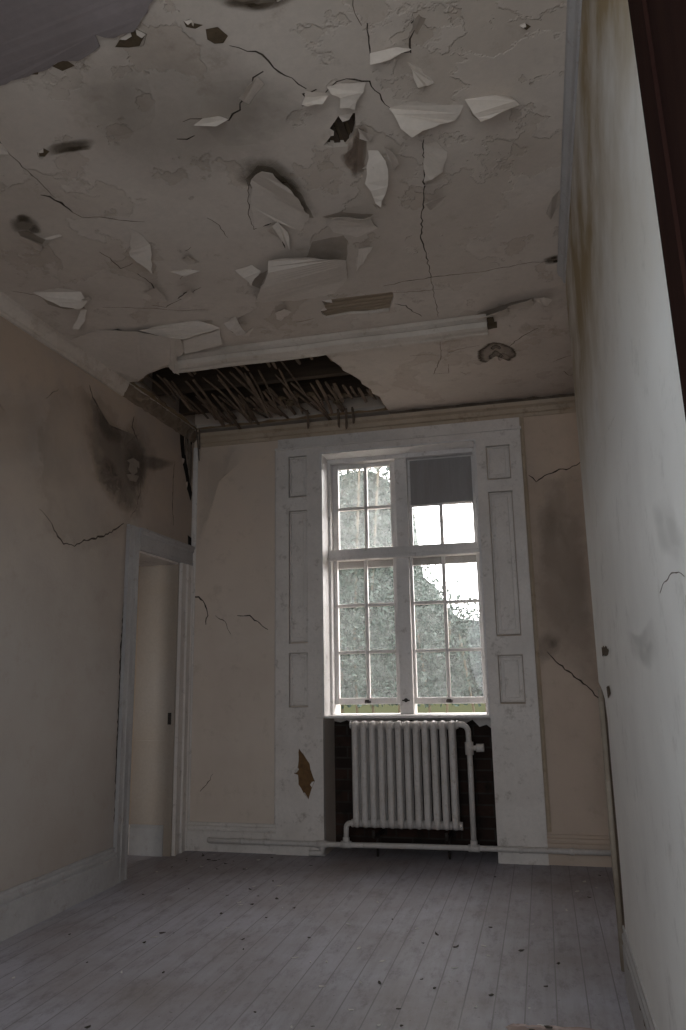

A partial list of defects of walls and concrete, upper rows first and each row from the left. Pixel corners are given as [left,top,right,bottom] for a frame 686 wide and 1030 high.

peeling [0,0,153,86]
spalling [184,18,228,44]
peeling [194,116,228,126]
crack [227,45,390,121]
crack [352,0,371,53]
crack [0,142,141,222]
peeling [235,77,399,321]
crack [385,139,546,316]
peeling [33,288,254,380]
crack [40,418,143,547]
crack [547,652,598,698]
peeling [294,749,315,799]